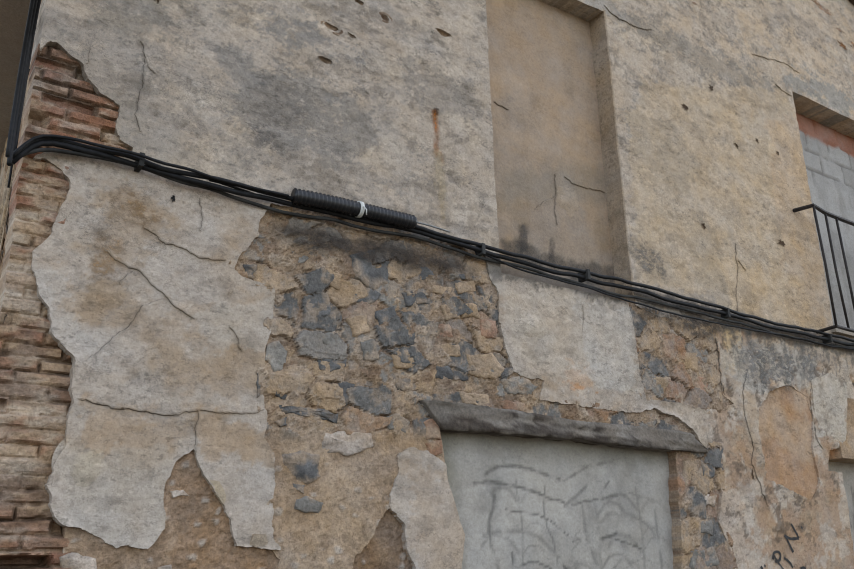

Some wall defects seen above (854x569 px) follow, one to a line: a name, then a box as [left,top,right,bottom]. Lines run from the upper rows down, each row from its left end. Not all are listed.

crack [605,6,652,30]
crack [135,40,156,132]
crack [752,53,800,73]
crack [535,174,605,225]
crack [144,226,226,260]
water stain [504,225,614,282]
crack [87,250,196,362]
flaking render [0,43,738,569]
crack [76,397,264,453]